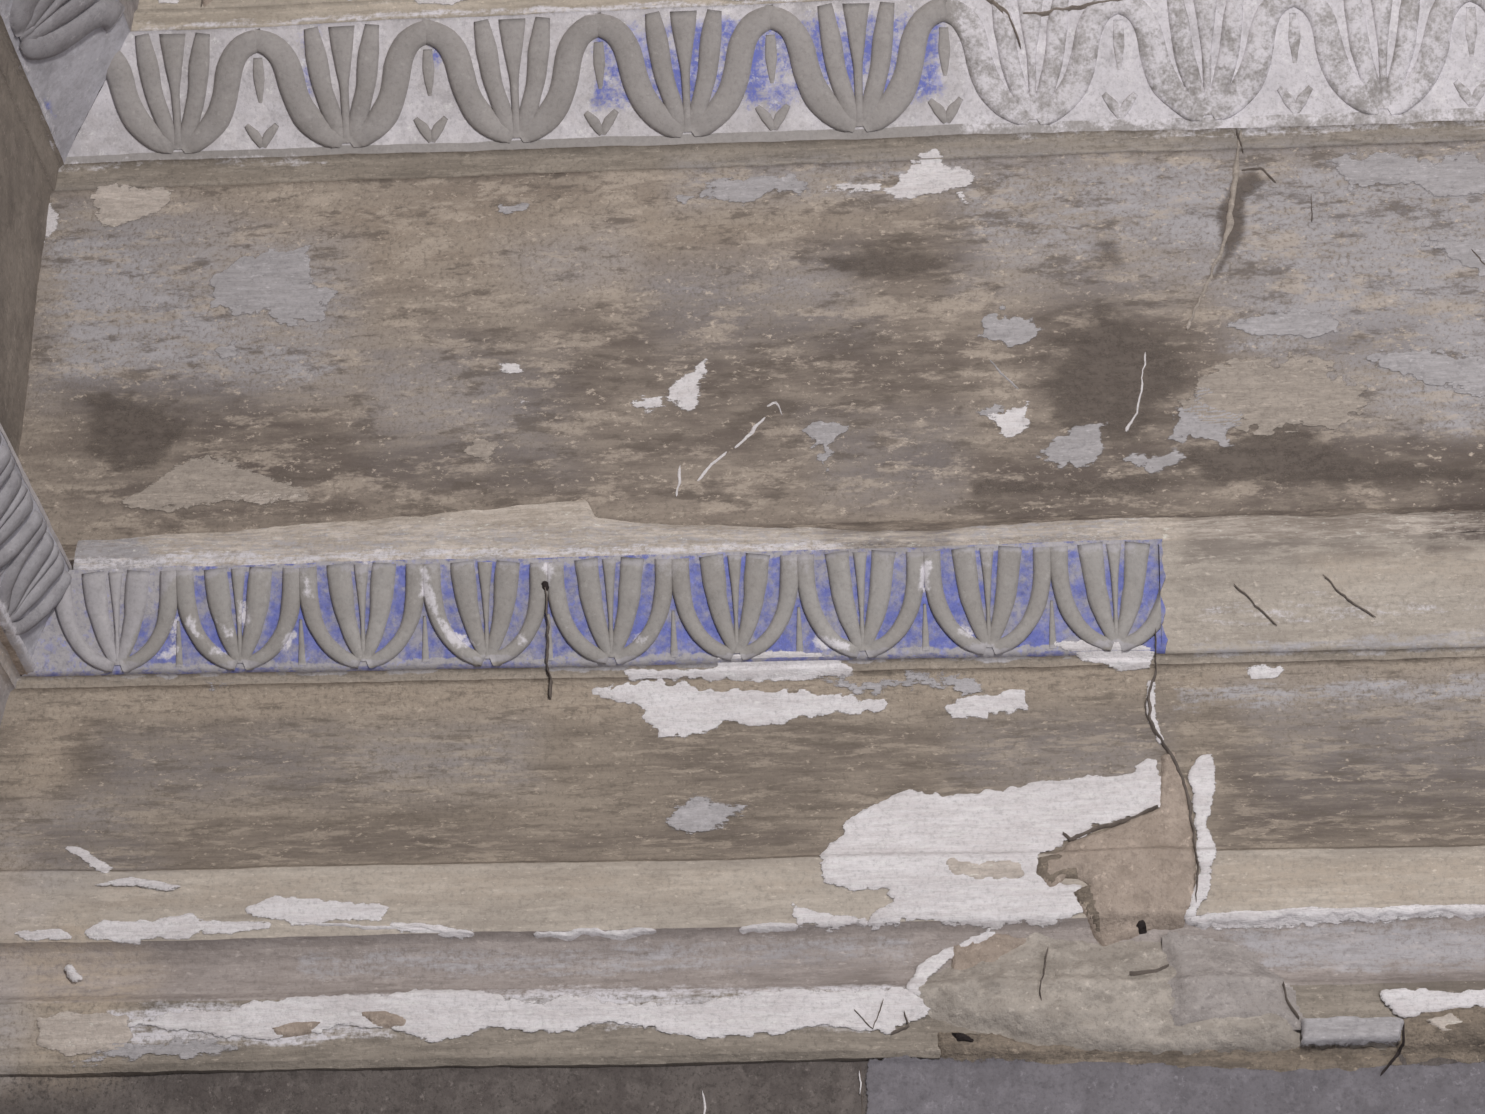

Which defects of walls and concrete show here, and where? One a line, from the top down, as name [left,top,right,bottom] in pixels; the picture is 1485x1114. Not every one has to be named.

crack [986,0,1122,49]
peeling [498,203,529,214]
peeling [676,148,975,206]
crack [1186,130,1276,330]
leakage [1048,307,1182,436]
leakage [1192,432,1431,481]
crack [541,580,553,699]
peeling [592,650,1029,737]
peeling [1054,640,1155,672]
peeling [1246,664,1284,679]
crack [1145,628,1217,920]
peeling [14,752,1485,1075]